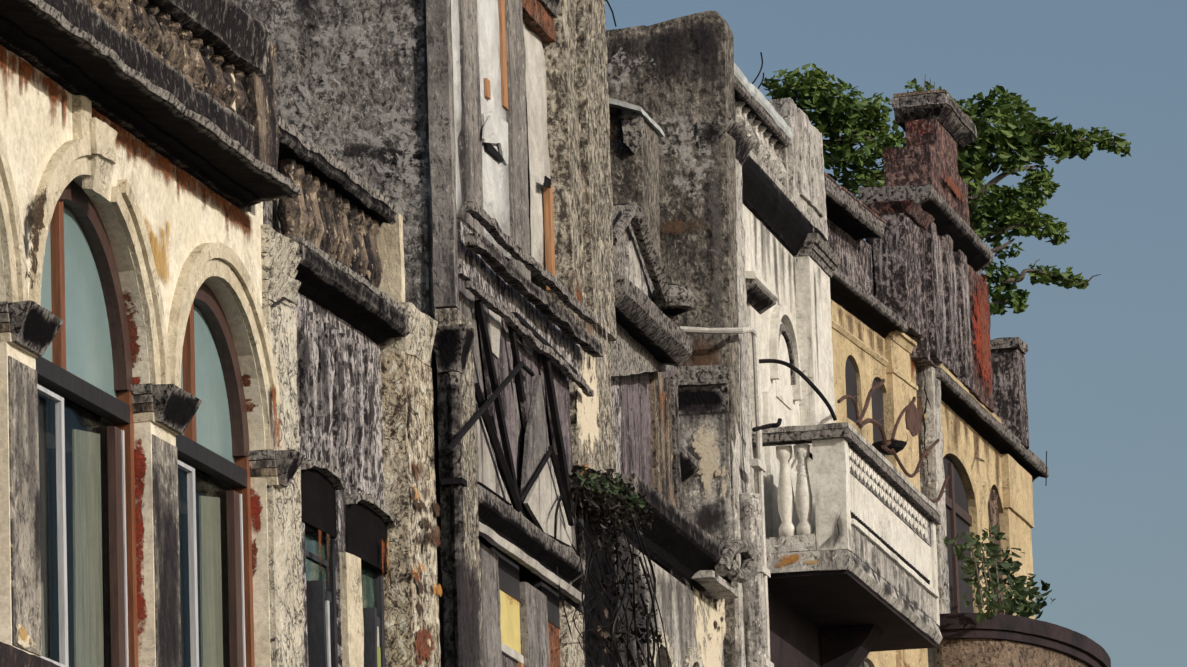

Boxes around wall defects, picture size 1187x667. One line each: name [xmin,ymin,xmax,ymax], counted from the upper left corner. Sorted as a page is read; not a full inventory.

rust [0,44,68,127]
rust [91,108,252,242]
flaking render [973,275,992,395]
flaking render [692,420,727,499]
peeling [134,438,147,656]
leakage [152,470,183,667]
peeling [250,488,263,577]